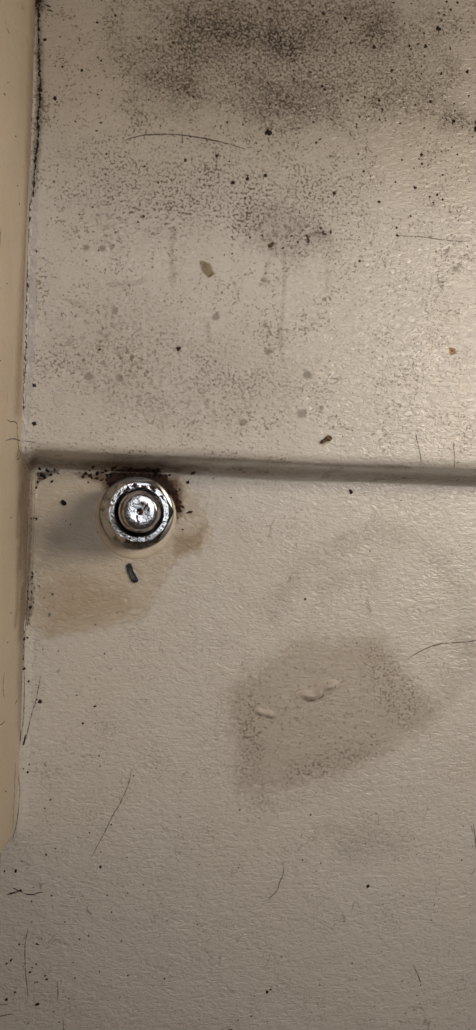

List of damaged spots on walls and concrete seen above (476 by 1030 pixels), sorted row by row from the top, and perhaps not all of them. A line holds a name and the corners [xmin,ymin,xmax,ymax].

leakage [97,0,476,162]
corrosion [78,465,196,530]